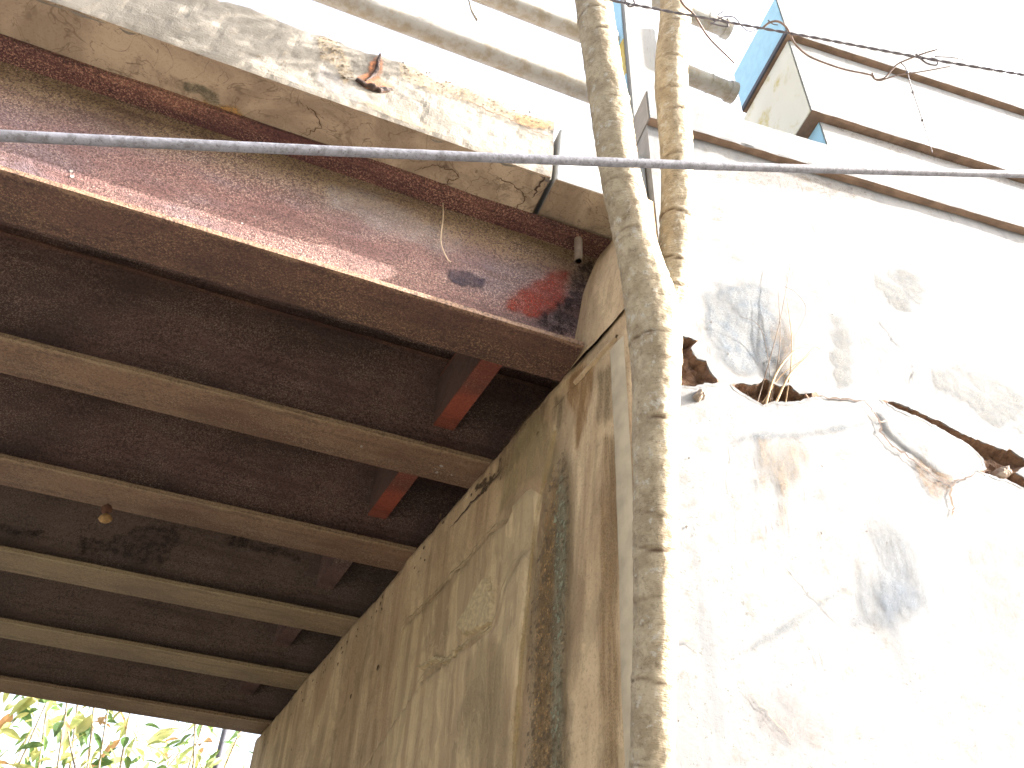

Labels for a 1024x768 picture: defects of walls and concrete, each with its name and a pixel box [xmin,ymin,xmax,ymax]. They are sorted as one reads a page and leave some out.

rust [355,53,393,93]
rust [449,270,485,288]
rust [507,261,593,335]
spalling [681,333,722,402]
crack [730,375,1024,515]
damp [501,400,570,768]